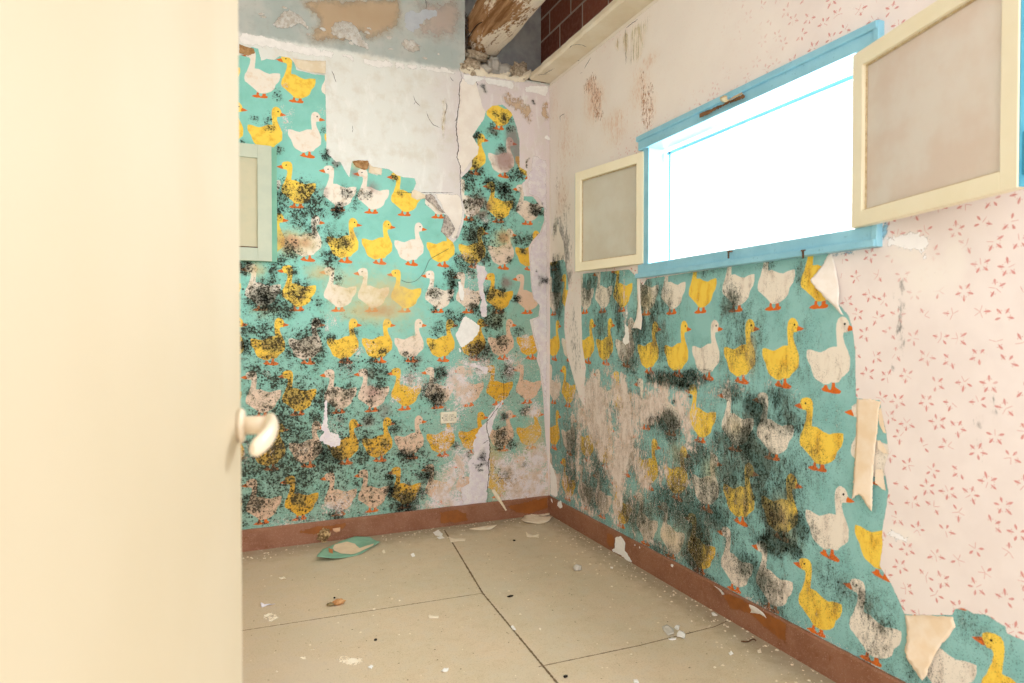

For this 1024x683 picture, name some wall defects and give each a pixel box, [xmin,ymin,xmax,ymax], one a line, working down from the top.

spalling [258,6,371,49]
crack [403,12,477,201]
peeling [457,48,533,172]
water stain [504,92,549,120]
water stain [247,279,291,316]
water stain [632,367,706,398]
peeling [437,400,504,539]
water stain [383,474,415,512]
water stain [751,490,802,560]